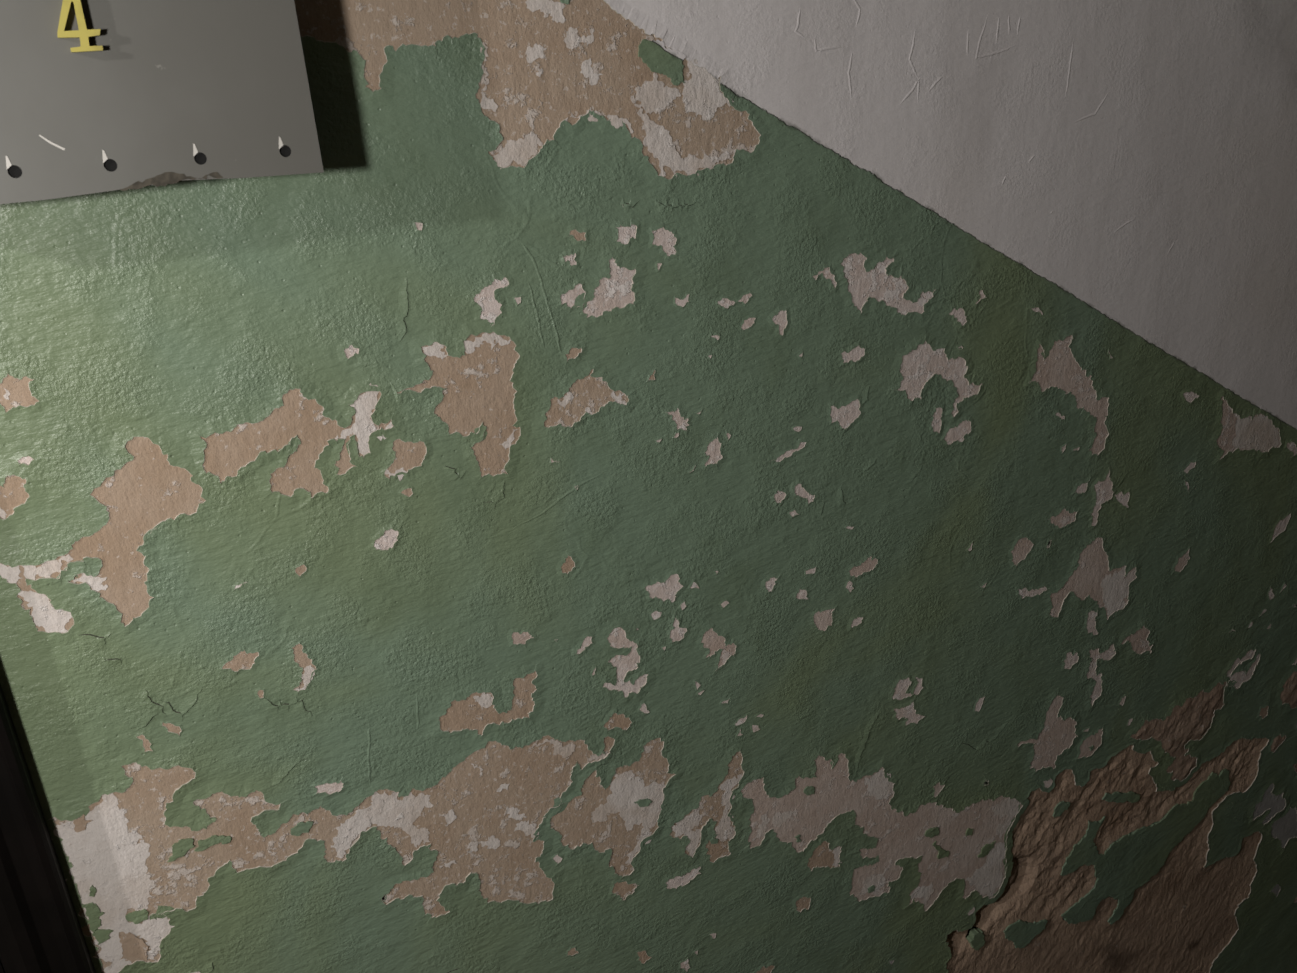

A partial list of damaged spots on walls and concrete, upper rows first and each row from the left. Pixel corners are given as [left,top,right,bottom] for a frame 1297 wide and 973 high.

peeling [294,0,771,193]
peeling [0,204,681,645]
peeling [673,292,691,309]
peeling [715,290,791,341]
peeling [807,241,989,448]
peeling [43,328,1297,973]